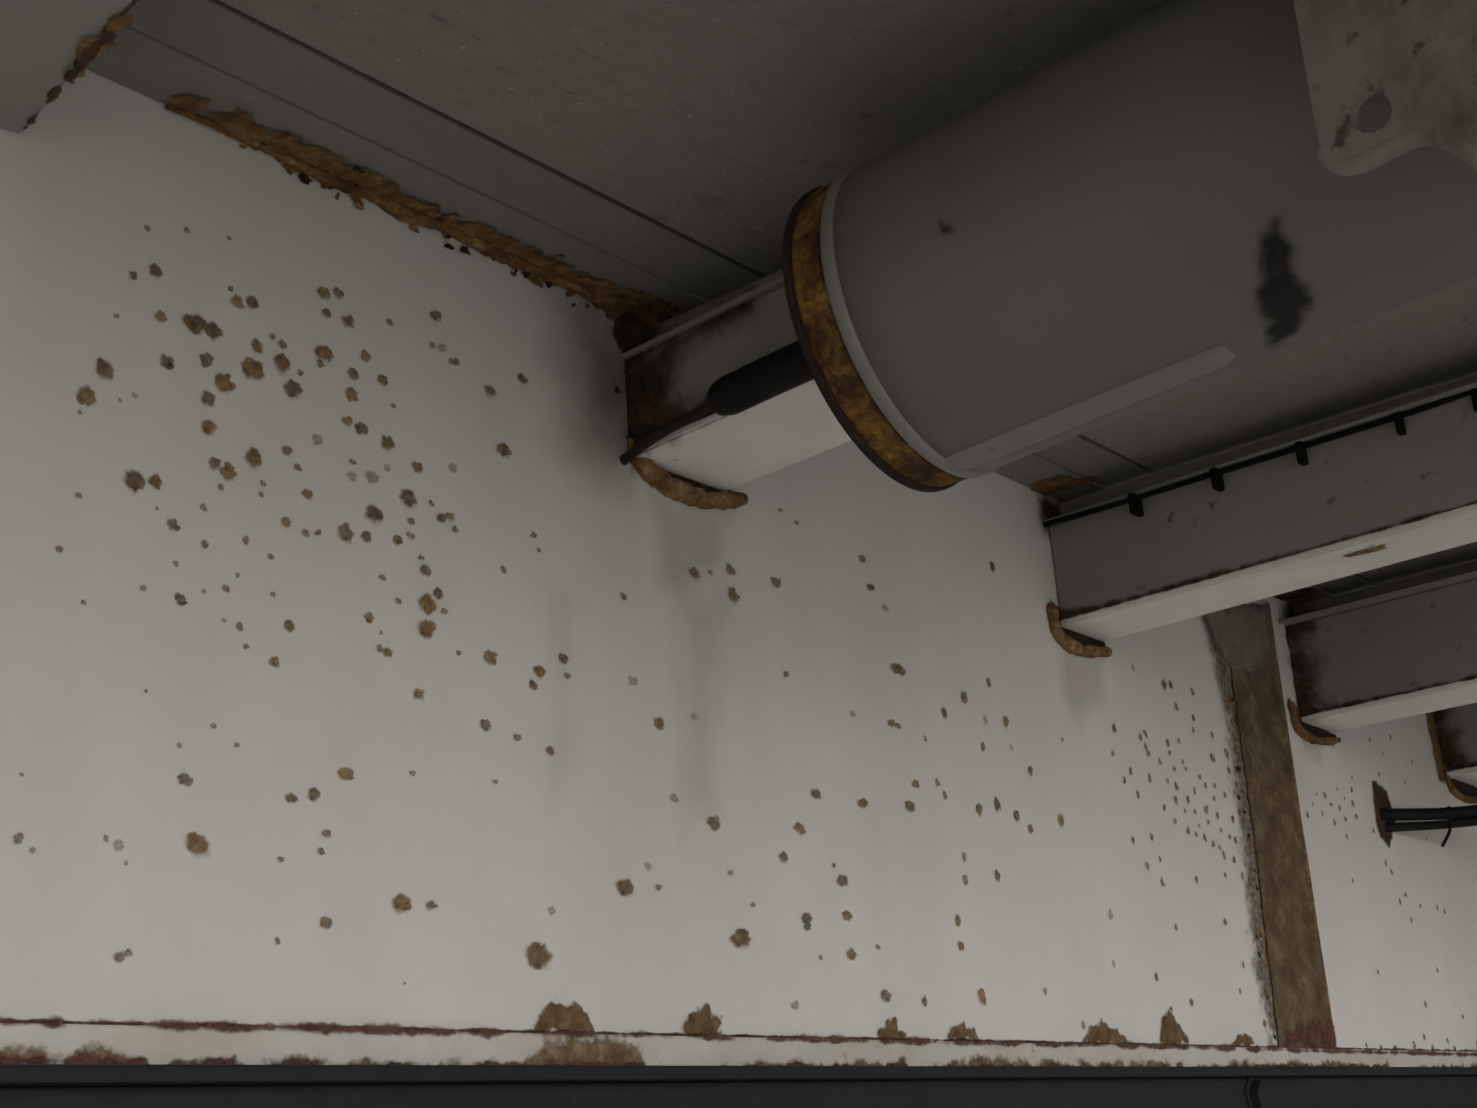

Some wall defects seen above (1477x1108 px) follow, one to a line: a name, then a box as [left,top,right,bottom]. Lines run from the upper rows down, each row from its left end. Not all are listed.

corrosion [792,181,968,487]
leakage [1258,225,1312,342]
corrosion [282,517,321,537]
corrosion [175,573,240,605]
corrosion [0,588,1477,1067]